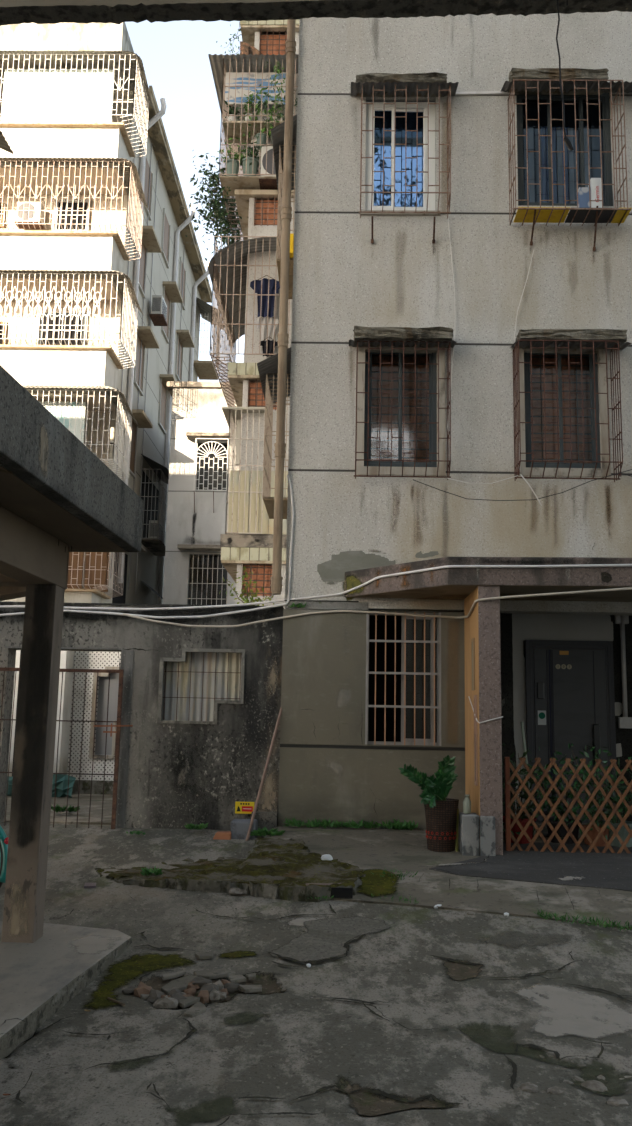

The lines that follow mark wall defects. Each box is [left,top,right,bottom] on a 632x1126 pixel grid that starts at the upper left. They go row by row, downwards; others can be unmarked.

spalling [135,973,285,1010]